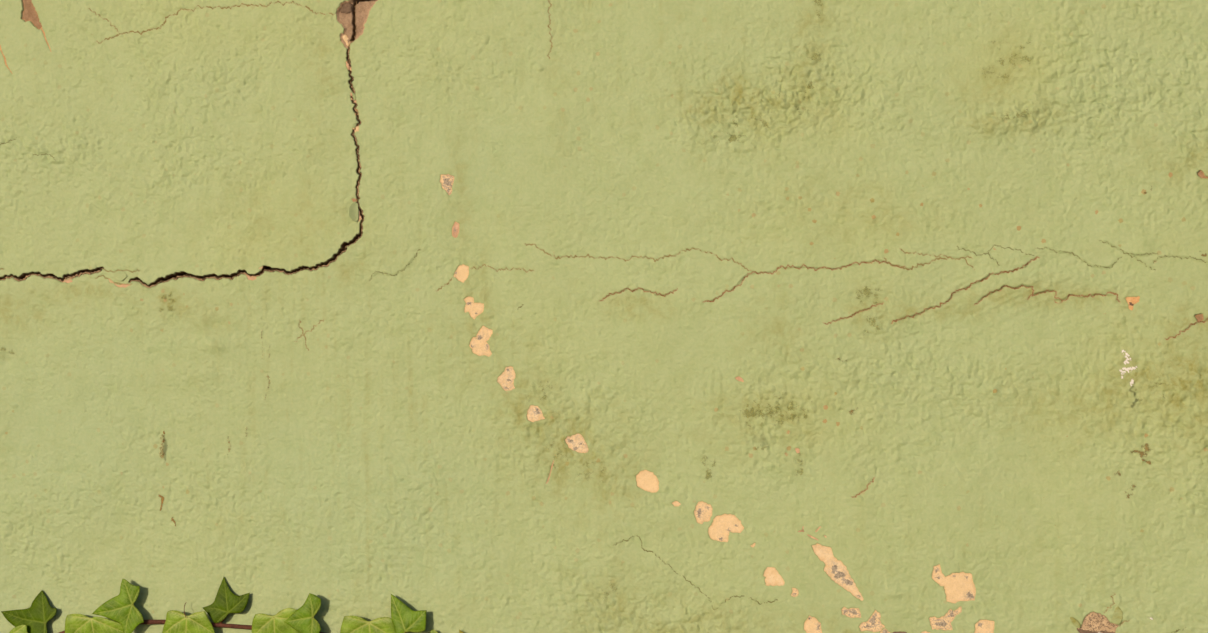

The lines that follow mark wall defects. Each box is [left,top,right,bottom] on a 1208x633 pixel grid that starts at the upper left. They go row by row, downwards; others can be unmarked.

peeling [22,0,42,29]
crack [546,0,554,59]
crack [0,1,365,288]
crack [438,240,1206,325]
peeling [454,265,493,357]
peeling [497,366,515,391]
peeling [527,405,545,422]
peeling [565,434,588,453]
peeling [636,470,659,493]
peeling [672,501,744,542]
peeling [812,544,976,633]
peeling [1070,606,1123,633]